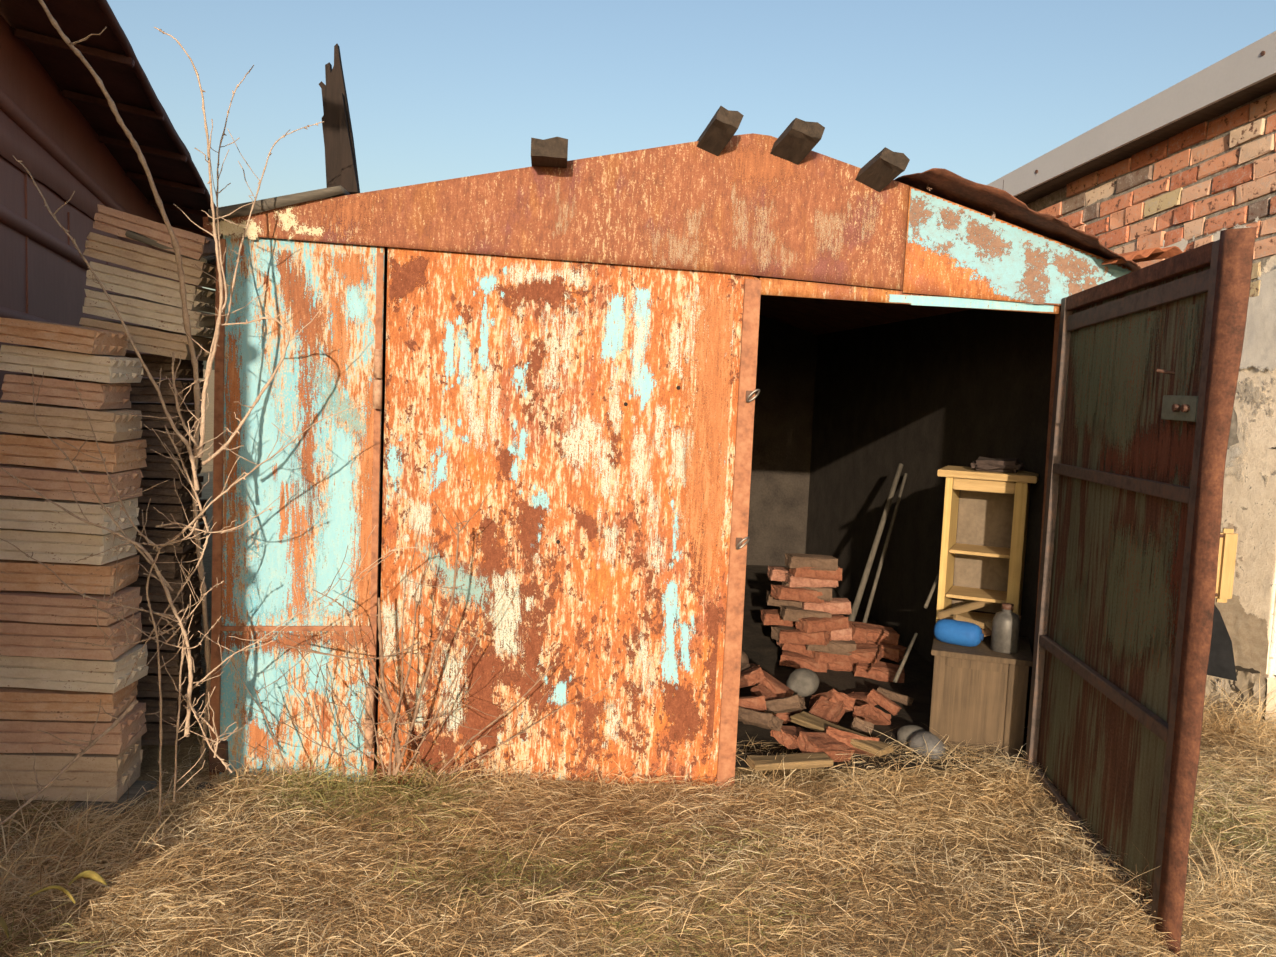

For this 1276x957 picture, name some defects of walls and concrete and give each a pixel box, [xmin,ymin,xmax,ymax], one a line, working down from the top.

rust [714,138,807,203]
flaking render [888,90,1276,312]
peeling [207,206,361,626]
rust [221,193,436,661]
peeling [343,273,374,340]
rust [494,270,587,425]
rust [605,412,623,469]
rust [428,440,549,610]
rust [567,502,612,561]
rust [661,279,735,765]
peeling [232,636,371,767]
rust [409,618,558,776]